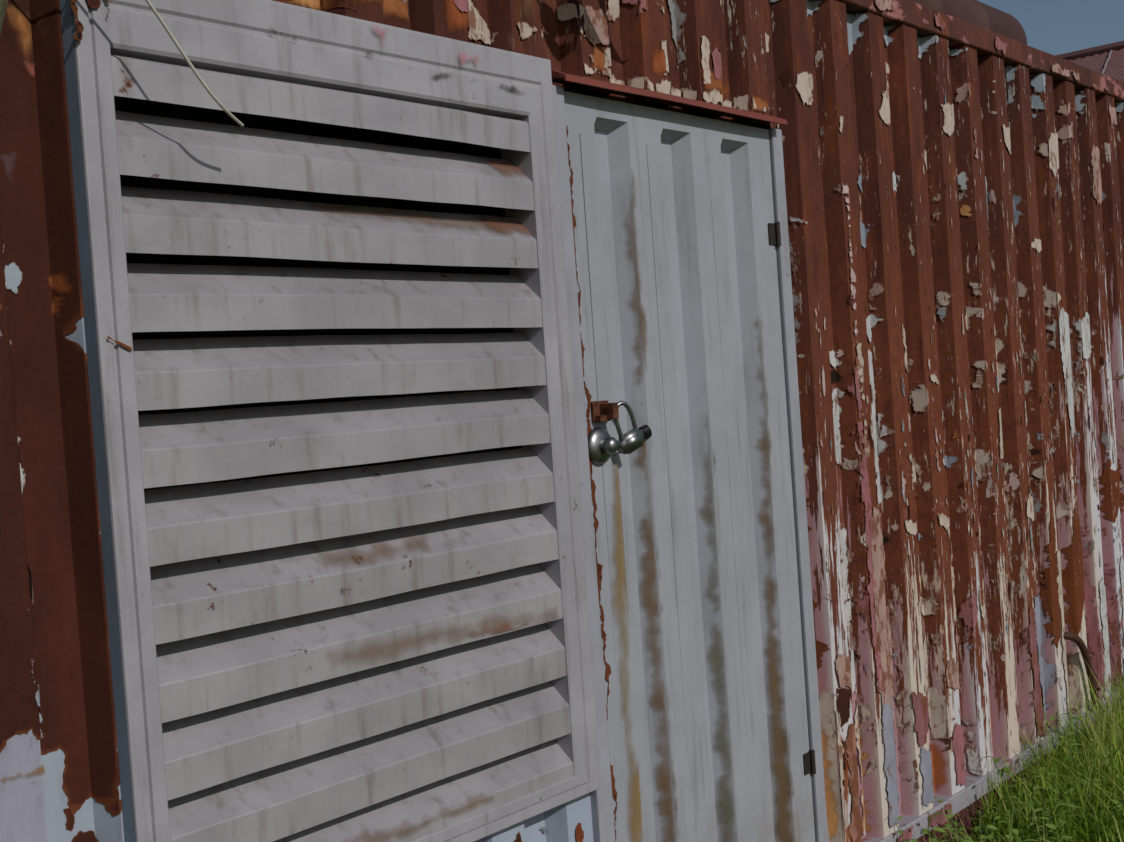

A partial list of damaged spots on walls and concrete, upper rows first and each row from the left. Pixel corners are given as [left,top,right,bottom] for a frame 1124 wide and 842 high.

corrosion [273,0,357,13]
peeling [557,0,785,142]
peeling [795,48,824,105]
peeling [1030,64,1124,177]
corrosion [566,126,592,436]
corrosion [0,0,122,842]
peeling [972,286,1092,521]
corrosion [575,823,584,842]
corrosion [589,458,611,720]
corrosion [767,635,793,842]
peeling [819,281,1000,842]
peeling [1022,526,1124,740]